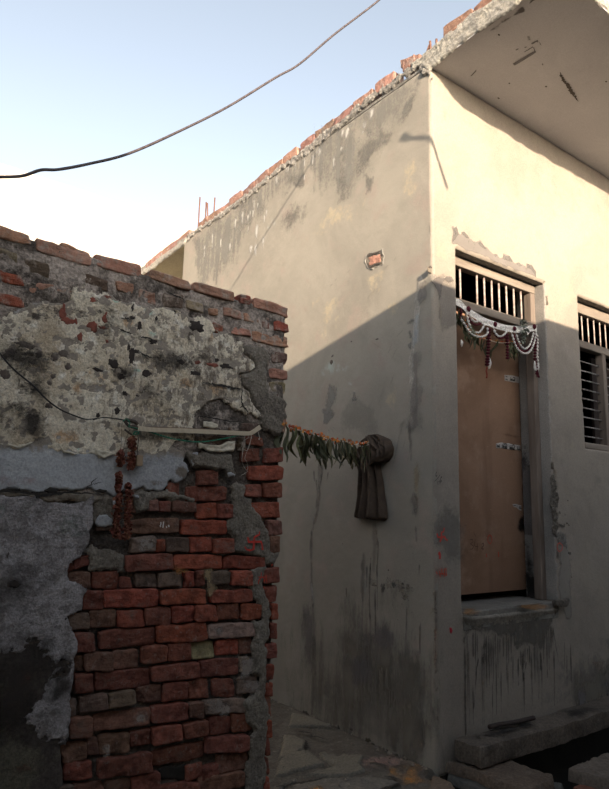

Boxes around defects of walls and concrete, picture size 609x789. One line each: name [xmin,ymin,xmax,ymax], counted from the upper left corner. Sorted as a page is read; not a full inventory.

leakage [195,86,404,284]
spalling [364,248,384,270]
spalling [59,303,109,342]
spalling [189,320,204,333]
spalling [4,341,72,370]
spalling [92,359,126,380]
spalling [127,343,139,364]
spalling [179,358,234,376]
flaking render [191,441,235,466]
flaking render [95,515,113,527]
leakage [463,533,571,735]
leakage [311,540,438,784]